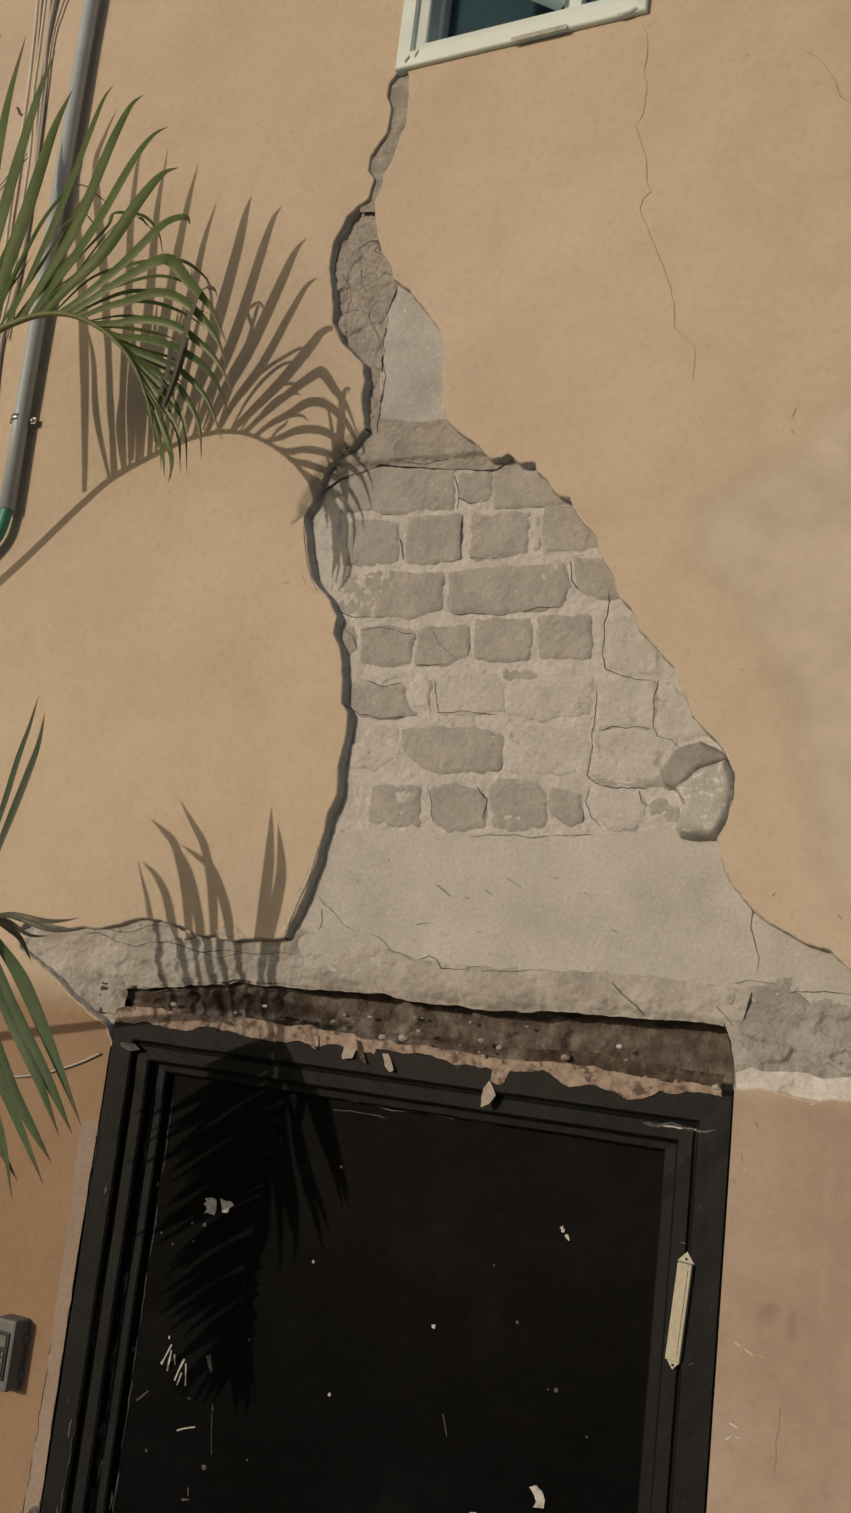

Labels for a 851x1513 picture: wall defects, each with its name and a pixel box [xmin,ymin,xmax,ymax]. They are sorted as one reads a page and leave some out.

spalling [17,72,851,1107]
crack [635,25,695,377]